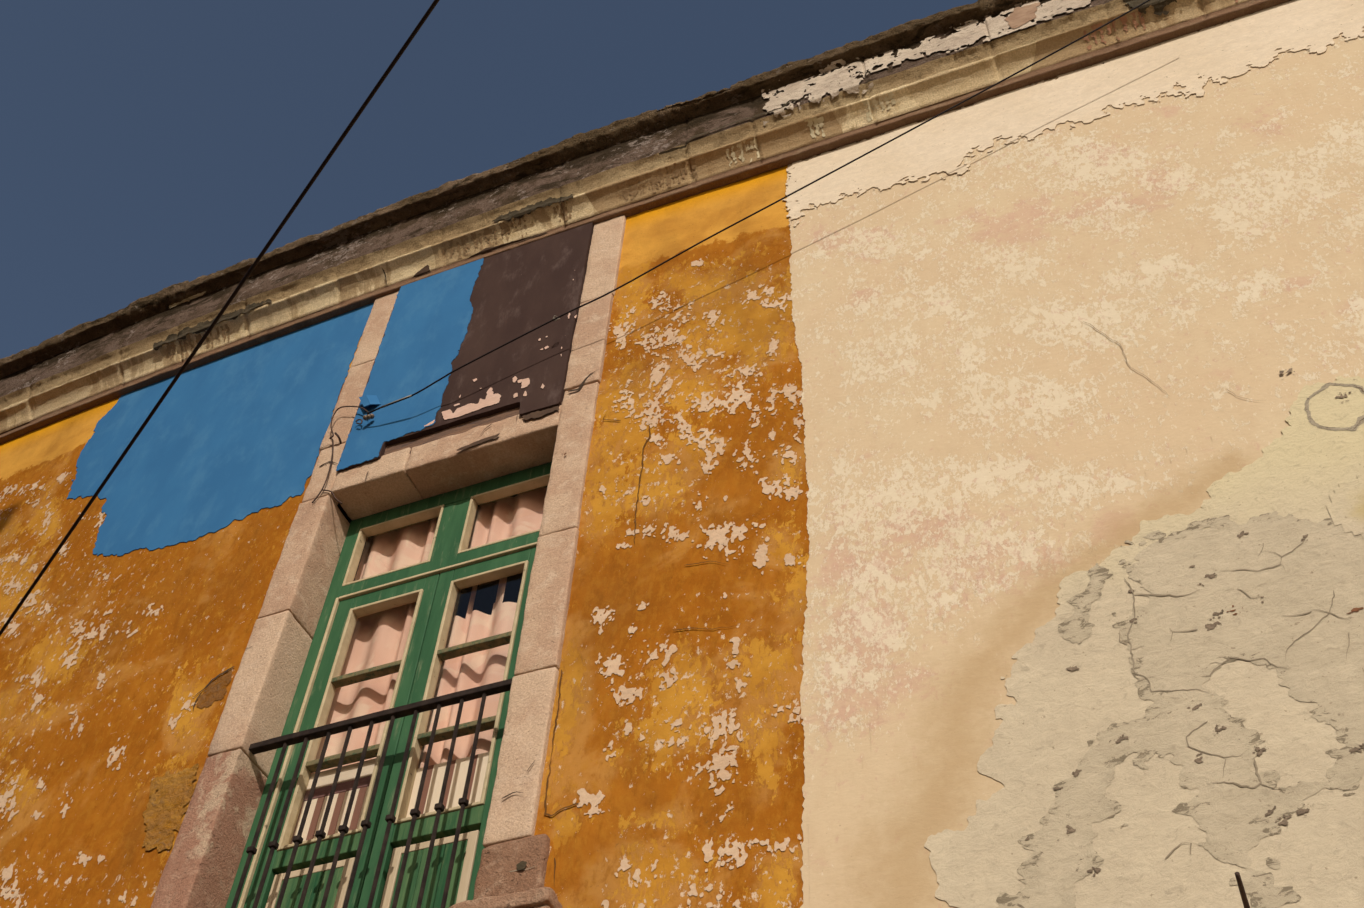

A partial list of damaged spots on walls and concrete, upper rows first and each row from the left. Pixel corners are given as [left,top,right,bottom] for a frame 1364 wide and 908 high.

peeling [761,0,1364,227]
peeling [425,376,545,426]
peeling [608,290,805,575]
crack [1083,321,1169,396]
crack [1304,382,1364,431]
peeling [0,553,53,640]
peeling [15,603,164,713]
spalling [924,376,1364,908]
crack [1119,543,1364,789]
peeling [595,642,744,822]
peeling [573,788,605,818]
peeling [685,837,802,908]